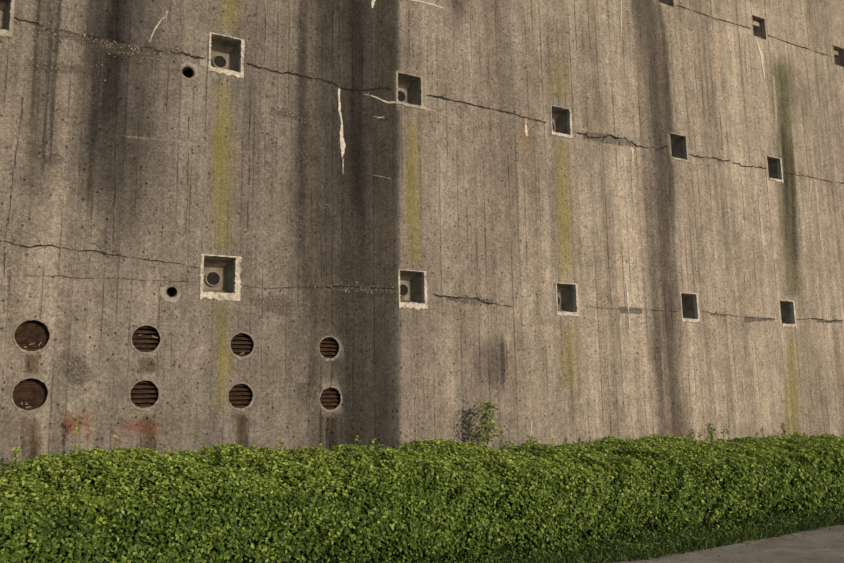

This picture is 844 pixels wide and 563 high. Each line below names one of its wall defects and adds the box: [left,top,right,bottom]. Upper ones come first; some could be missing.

crack [678,5,749,28]
crack [245,0,392,231]
crack [427,95,547,123]
crack [3,12,206,288]
crack [574,132,669,150]
crack [691,154,844,184]
crack [434,294,512,309]